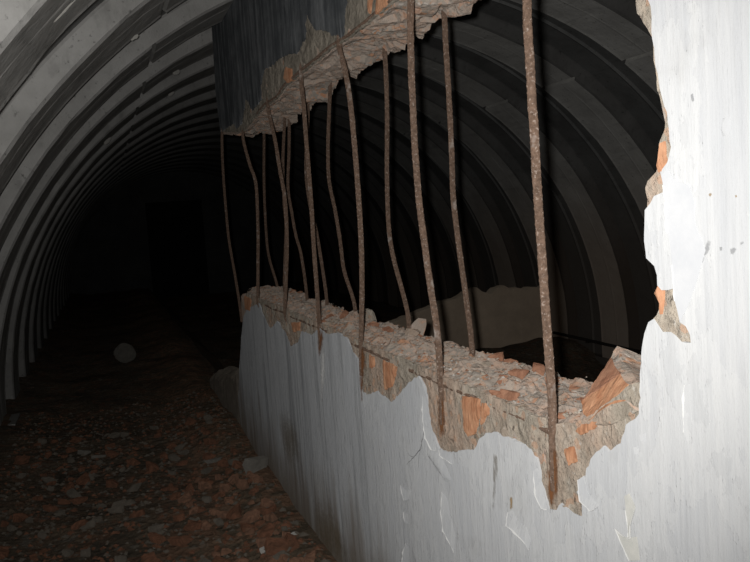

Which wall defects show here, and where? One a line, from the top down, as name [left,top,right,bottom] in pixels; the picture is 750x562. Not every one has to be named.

spalling [636,0,652,36]
spalling [645,45,671,207]
spalling [221,0,641,516]
spalling [654,286,691,342]
rust [548,451,557,505]